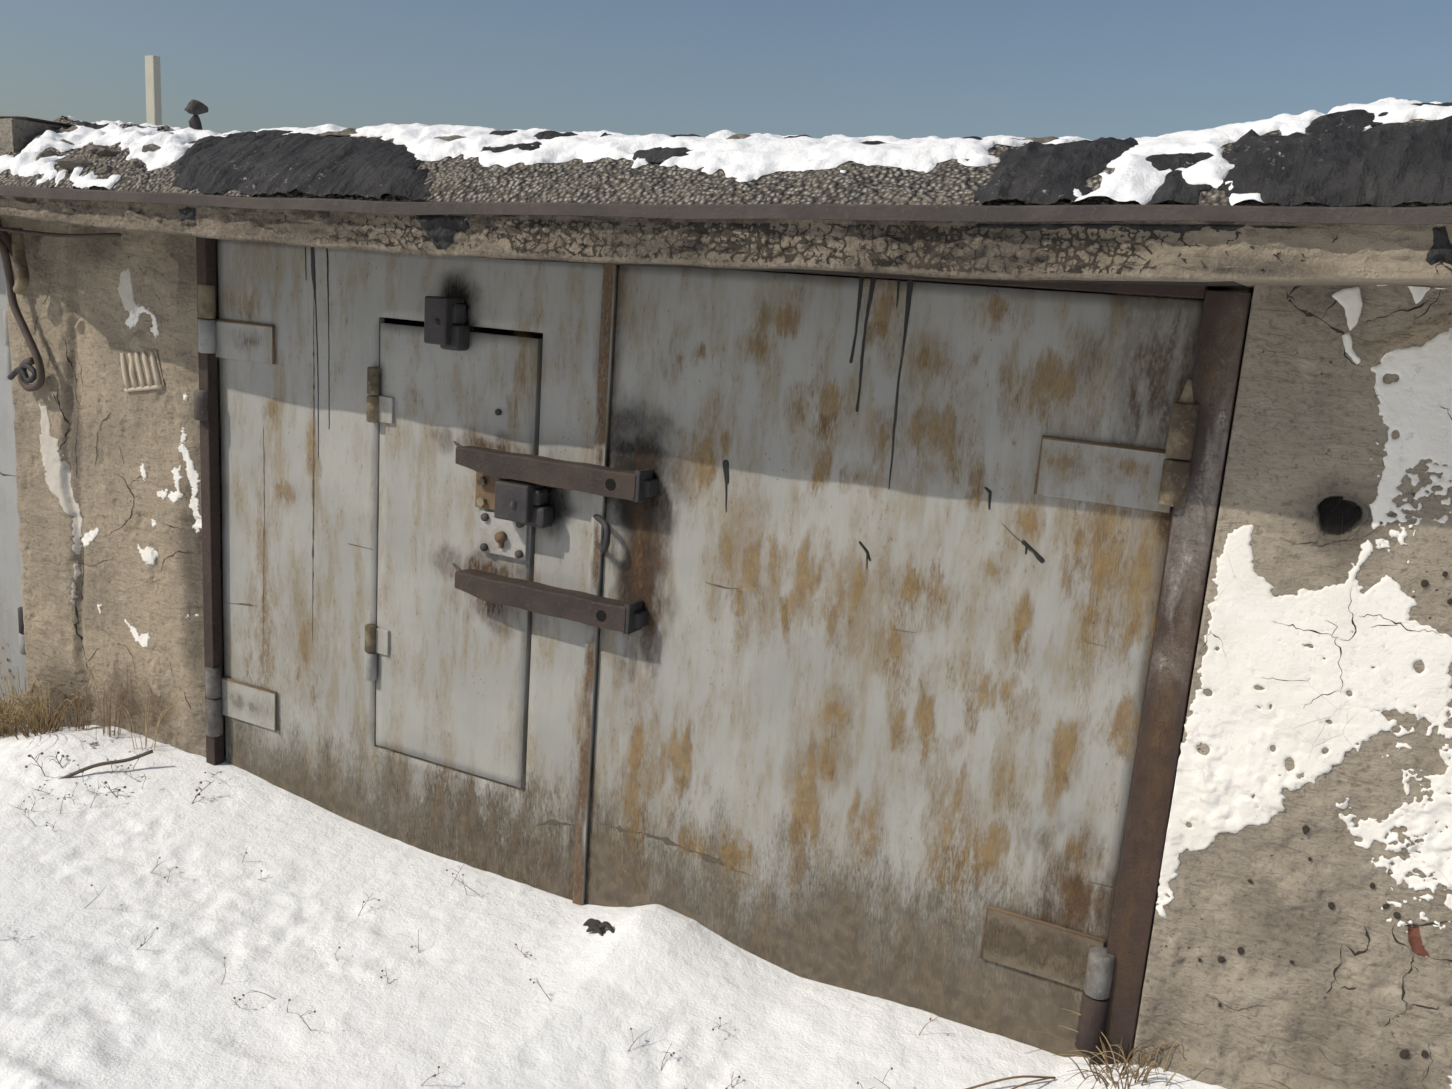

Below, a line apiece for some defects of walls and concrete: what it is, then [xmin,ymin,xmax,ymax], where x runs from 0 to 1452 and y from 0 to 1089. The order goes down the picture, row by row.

peeling [117,268,159,338]
corrosion [595,264,616,464]
crack [253,212,1452,367]
peeling [39,403,99,605]
crack [34,285,197,709]
peeling [124,619,150,647]
peeling [140,427,202,533]
corrosion [1063,505,1173,649]
peeling [1156,285,1452,958]
corrosion [572,645,594,906]
corrosion [624,723,692,844]
crack [1326,921,1452,1084]